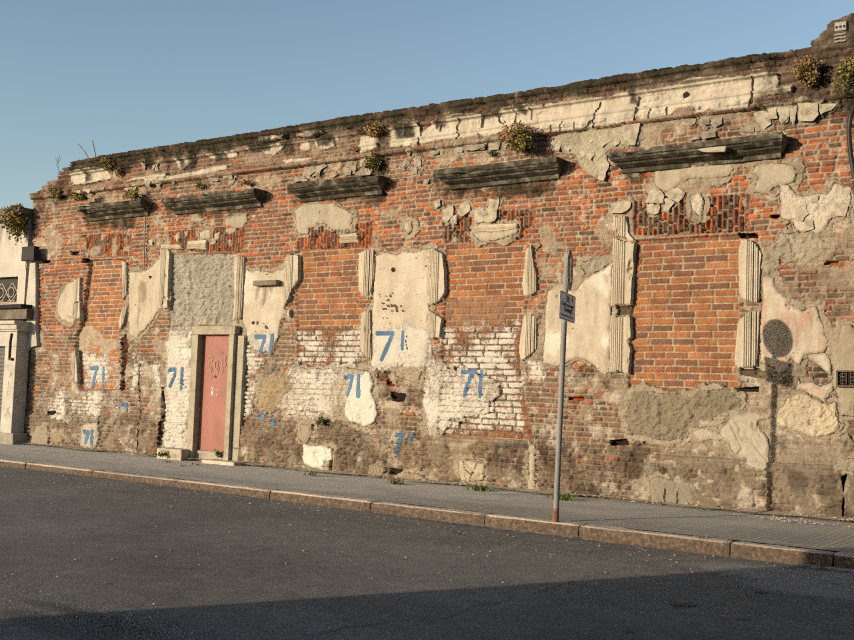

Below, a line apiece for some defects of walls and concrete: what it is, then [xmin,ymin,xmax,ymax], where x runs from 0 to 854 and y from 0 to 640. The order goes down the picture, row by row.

flaking render [66,69,840,196]
flaking render [292,200,359,239]
flaking render [432,195,525,248]
flaking render [54,278,79,327]
peeling [36,351,119,422]
peeling [124,212,249,449]
flaking render [239,242,635,440]
flaking render [606,154,854,446]